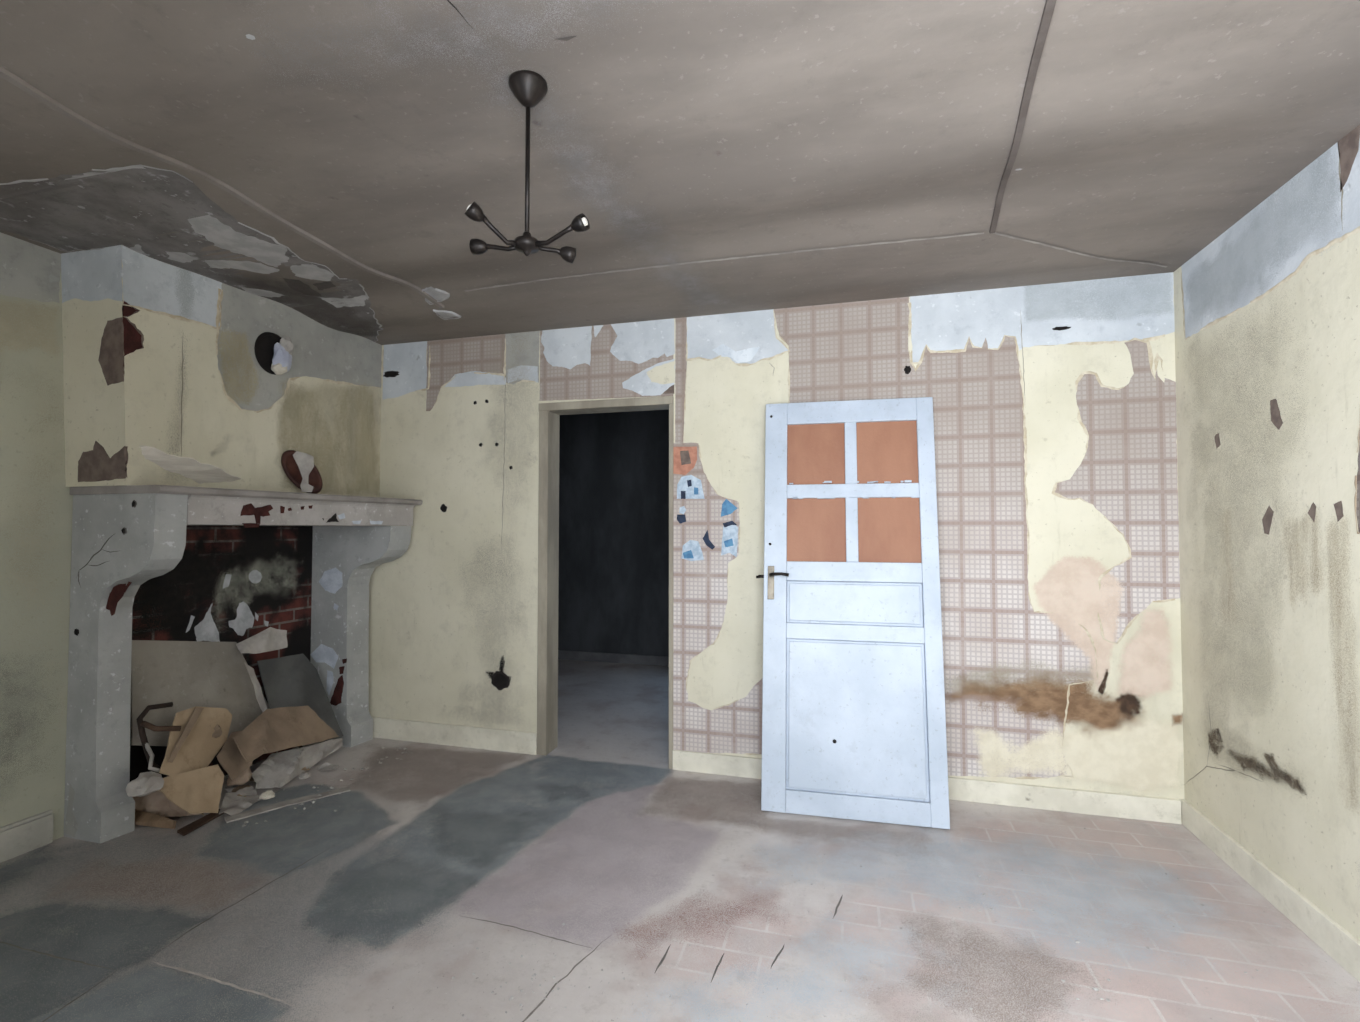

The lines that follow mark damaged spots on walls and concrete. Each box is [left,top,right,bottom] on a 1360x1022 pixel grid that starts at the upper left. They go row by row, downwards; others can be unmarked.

peeling [0,164,790,413]
flaking render [904,139,1360,382]
spalling [78,441,128,482]
peeling [1262,506,1274,535]
peeling [1270,399,1283,430]
peeling [1334,501,1344,521]
flaking render [1055,715,1184,795]
water stain [0,743,948,1022]
crack [459,915,610,1022]
water stain [836,909,1126,1022]